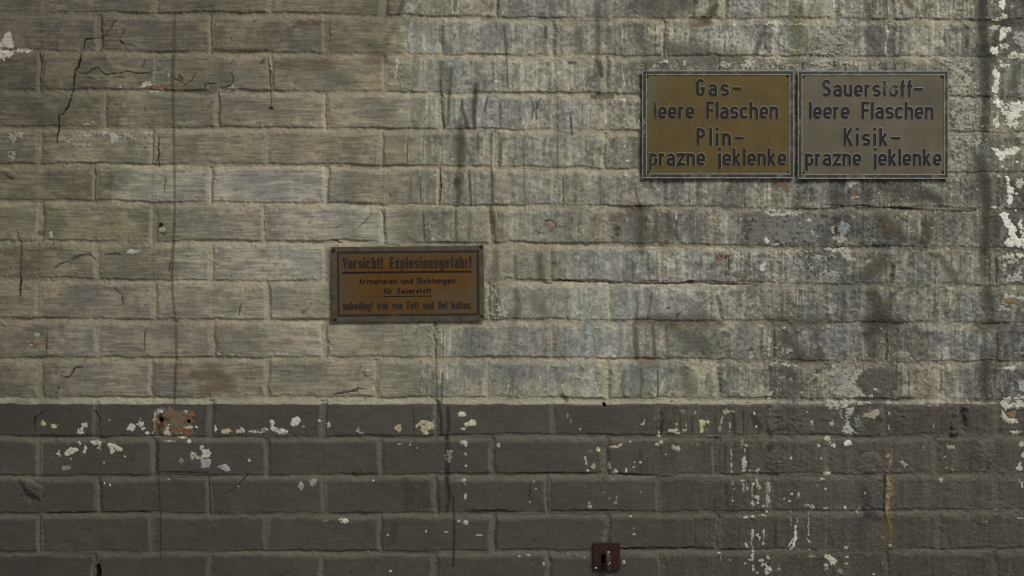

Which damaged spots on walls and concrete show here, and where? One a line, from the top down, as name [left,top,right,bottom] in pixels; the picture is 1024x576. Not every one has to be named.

peeling [0,31,33,61]
crack [56,23,149,143]
crack [175,75,236,92]
leakage [394,0,510,206]
peeling [989,0,1024,312]
peeling [56,421,126,471]
peeling [127,407,230,472]
peeling [214,416,306,435]
peeling [415,420,434,436]
peeling [441,412,476,499]
peeling [822,357,890,431]
peeling [1000,366,1024,488]